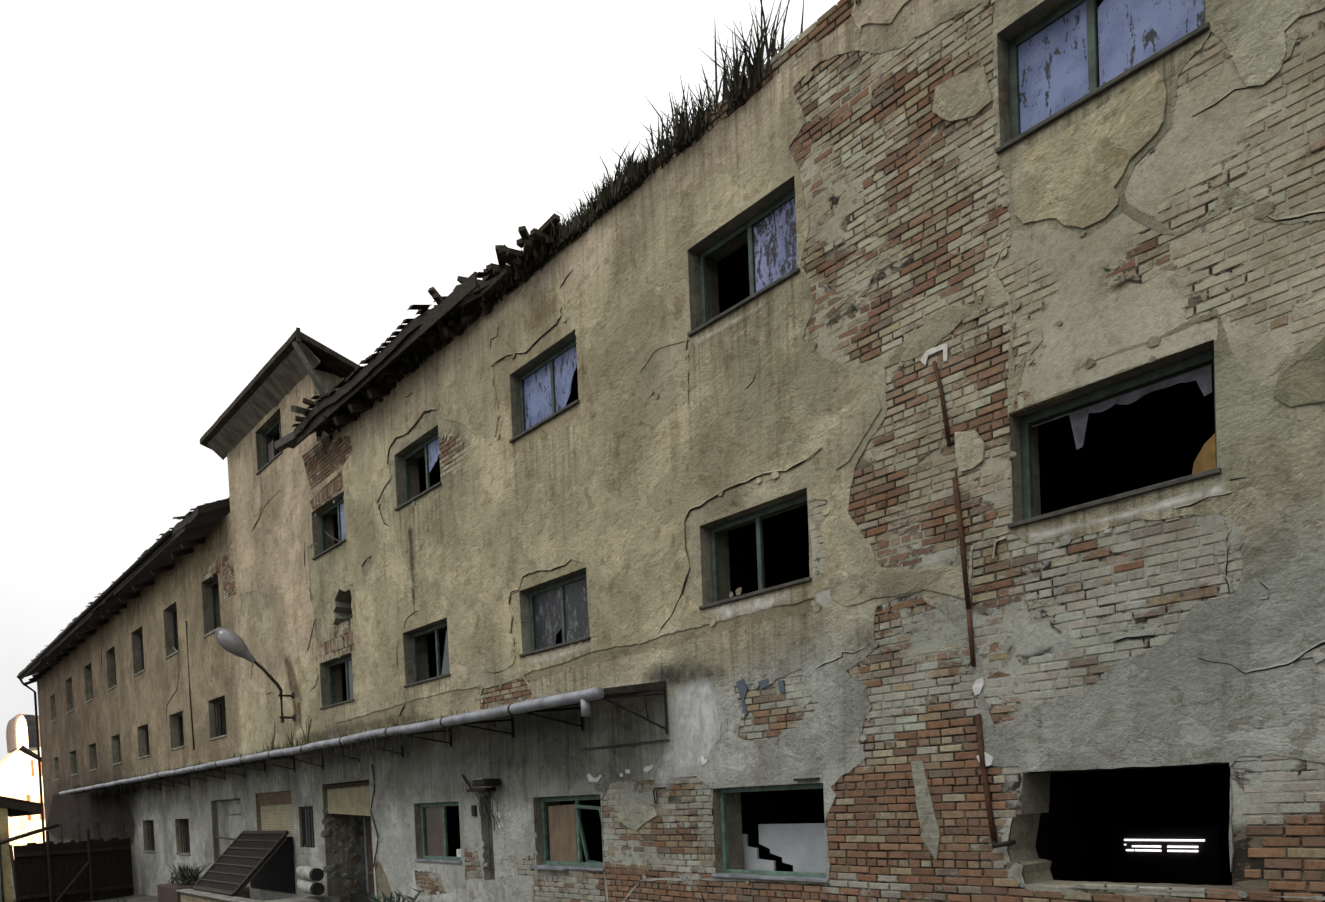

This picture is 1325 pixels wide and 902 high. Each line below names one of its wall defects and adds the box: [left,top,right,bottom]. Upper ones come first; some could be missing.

crack [490,269,573,446]
flaking render [302,435,353,517]
peeling [377,410,474,527]
flaking render [480,0,1325,902]
peeling [336,449,832,736]
crack [657,446,822,634]
crack [1195,640,1325,674]
flaking render [414,870,447,896]
flaking render [463,796,495,880]